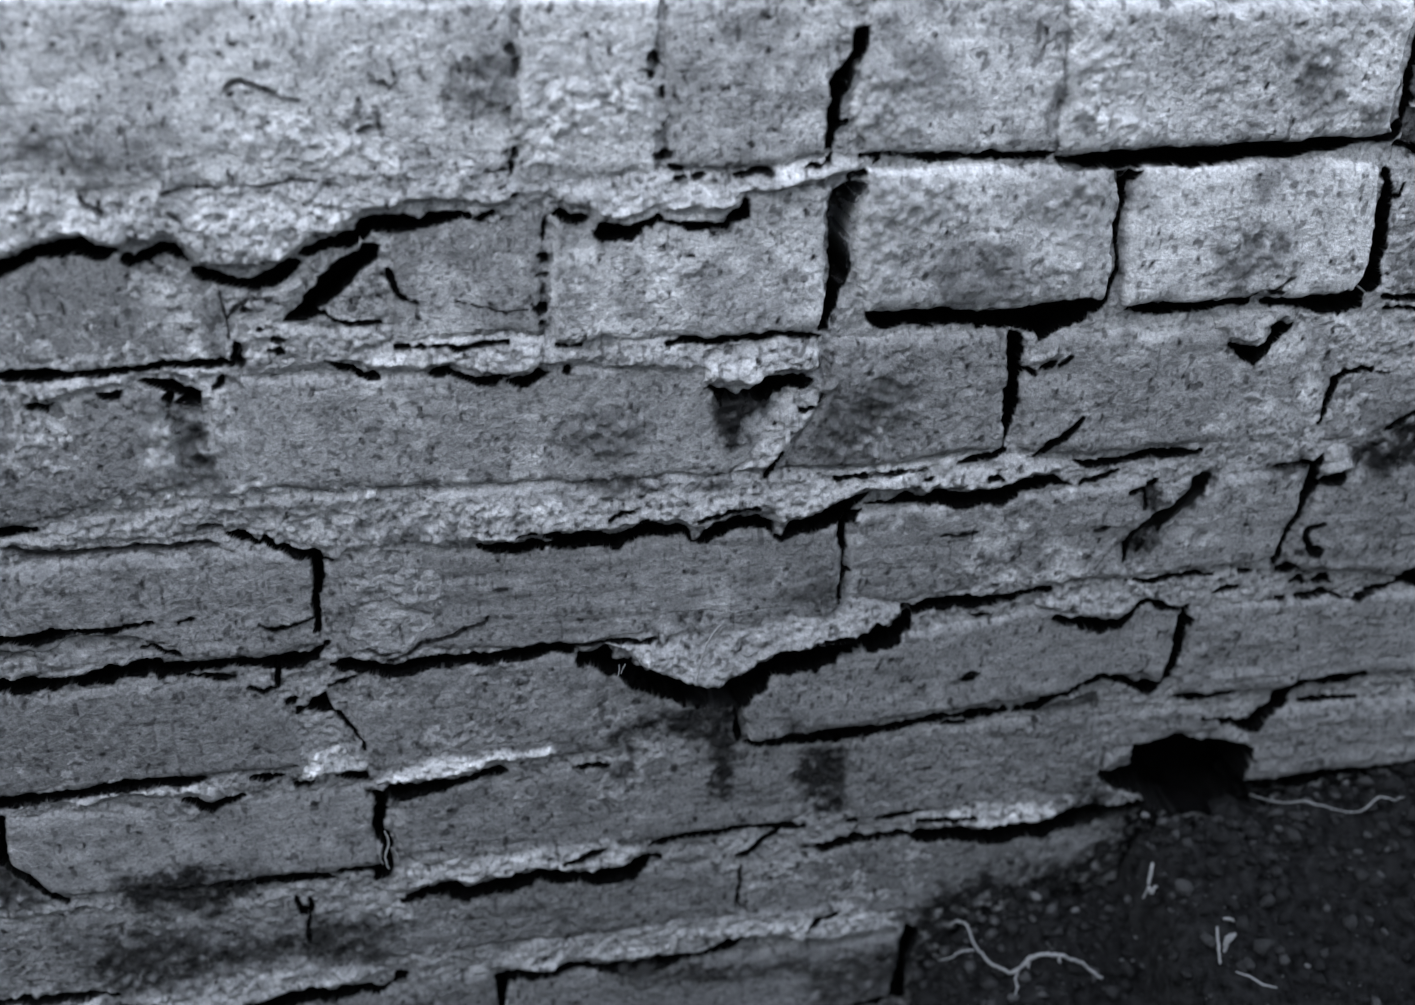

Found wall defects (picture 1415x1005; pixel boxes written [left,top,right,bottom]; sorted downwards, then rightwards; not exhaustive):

crack [551,197,750,243]
crack [0,195,496,339]
crack [1221,277,1296,365]
crack [428,364,572,388]
crack [1317,365,1390,425]
crack [0,523,223,558]
crack [1273,522,1415,602]
crack [0,617,196,656]
spalling [1102,745,1133,769]
crack [400,799,1137,903]
crack [190,845,387,943]
crack [250,969,409,1005]